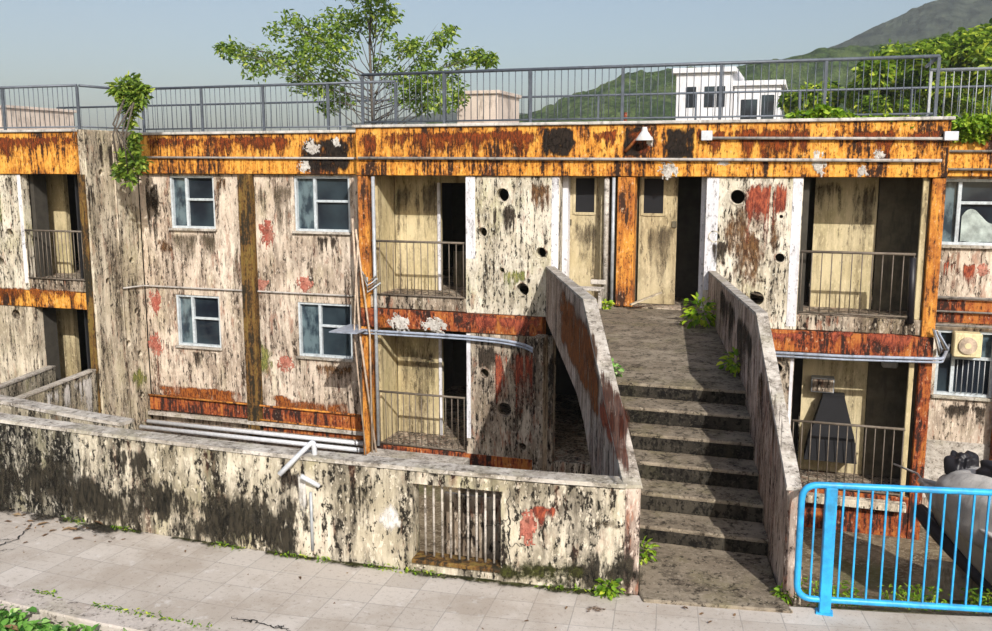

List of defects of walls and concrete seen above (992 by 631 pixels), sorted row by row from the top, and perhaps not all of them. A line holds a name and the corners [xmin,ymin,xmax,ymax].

rust [0,136,72,163]
rust [148,136,291,157]
peeling [296,136,341,173]
rust [364,130,540,157]
rust [584,129,653,163]
rust [697,129,822,166]
rust [835,130,940,159]
leakage [493,206,515,234]
leakage [47,378,92,410]
rust [160,385,241,402]
leakage [0,427,310,555]
peeling [520,509,537,546]